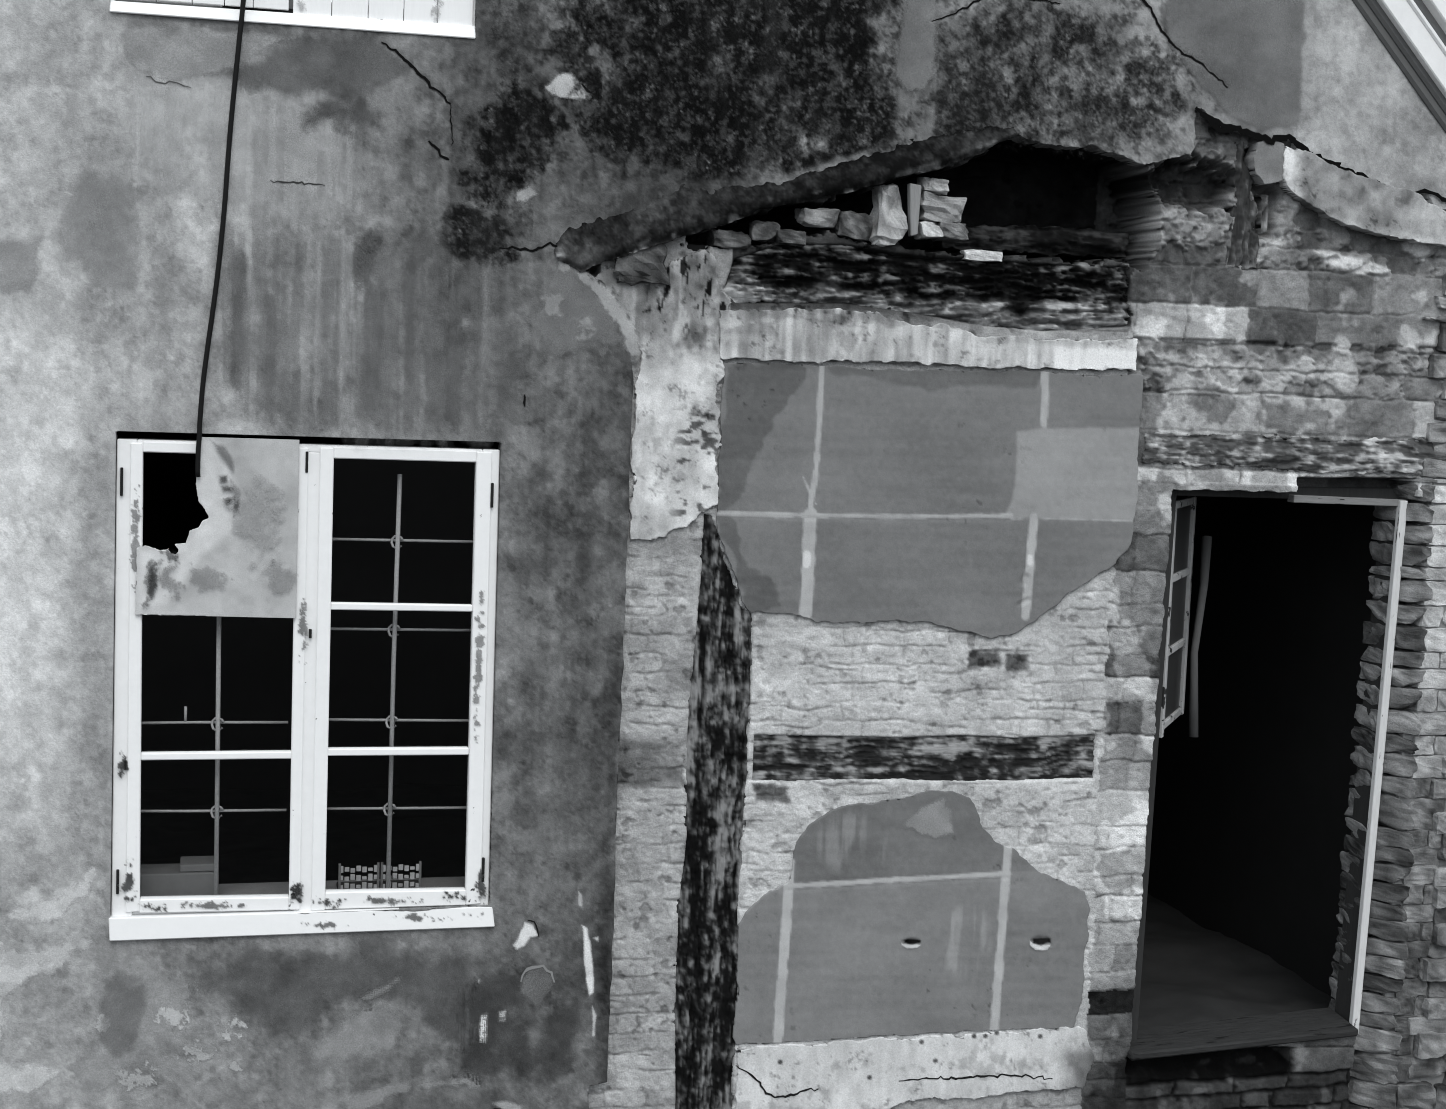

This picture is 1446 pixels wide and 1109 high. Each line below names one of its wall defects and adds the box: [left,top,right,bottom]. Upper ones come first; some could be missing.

crack [381,42,454,160]
leakage [551,0,898,180]
leakage [935,4,1194,155]
crack [1142,0,1380,182]
leakage [59,38,405,285]
leakage [223,0,559,428]
spalling [533,260,641,359]
peeling [514,920,539,949]
peeling [583,926,598,1036]
spalling [1030,938,1051,950]
crack [736,1065,818,1098]
crack [899,1073,1053,1082]